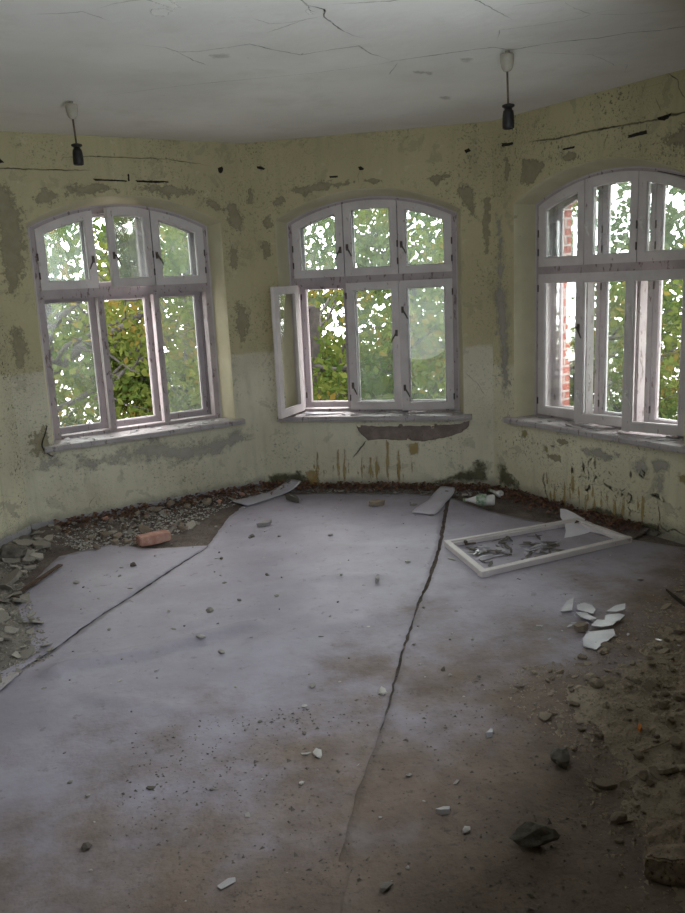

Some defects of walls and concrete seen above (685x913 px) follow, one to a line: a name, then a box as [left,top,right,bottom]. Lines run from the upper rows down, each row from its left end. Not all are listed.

water stain [0,183,28,297]
flaking render [341,413,470,442]